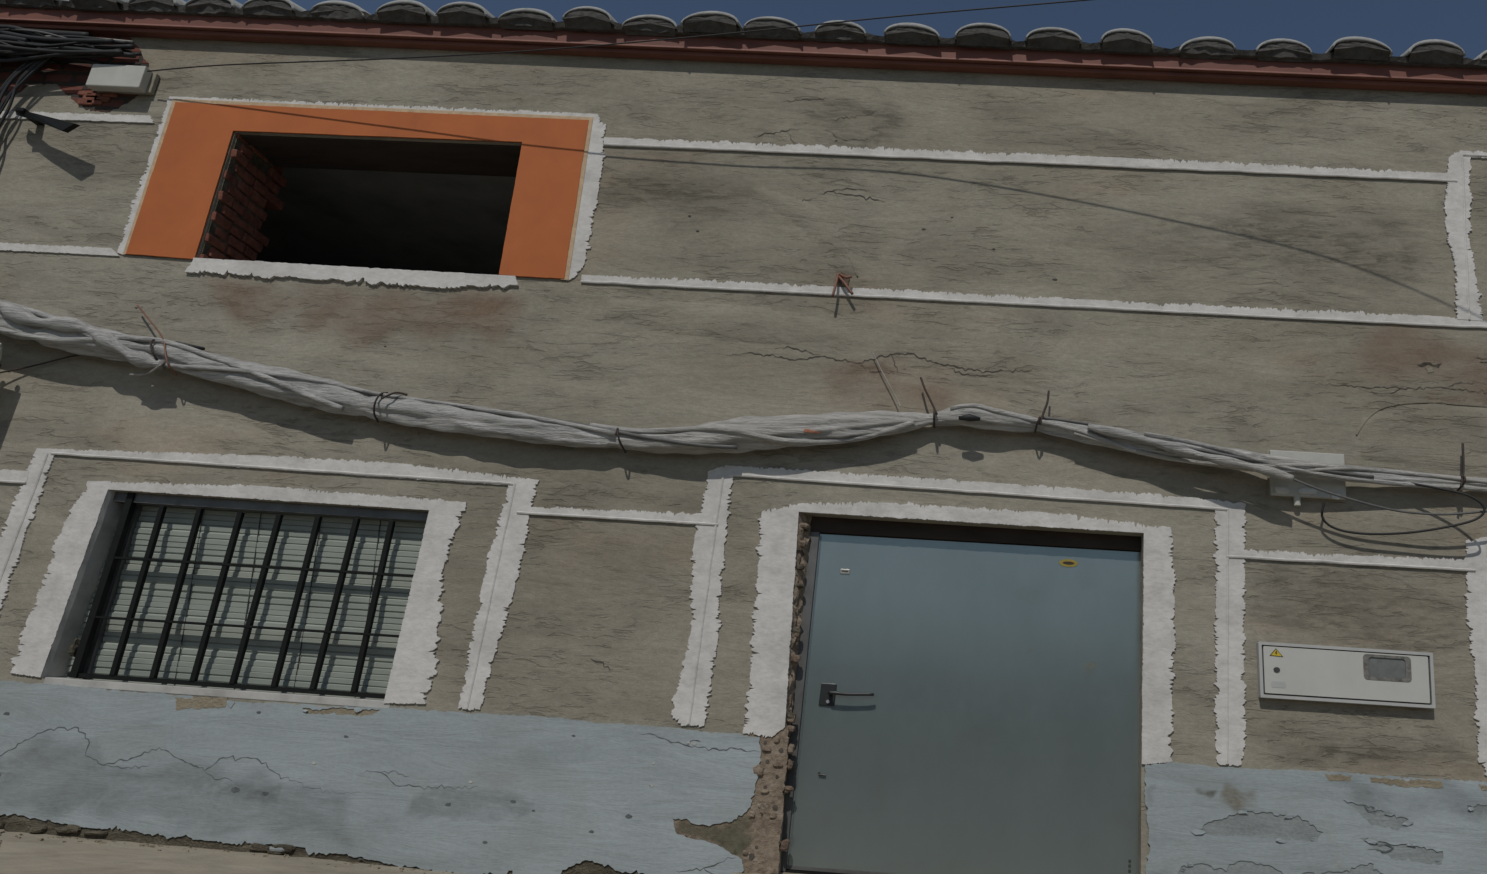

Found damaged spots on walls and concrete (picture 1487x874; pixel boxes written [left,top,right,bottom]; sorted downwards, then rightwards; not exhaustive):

spalling [0,35,149,112]
crack [715,346,1037,376]
spalling [673,513,812,874]
crack [0,727,478,794]
peeling [1370,777,1444,789]
spalling [0,814,432,871]
spalling [561,860,644,874]
peeling [1178,861,1283,874]
peeling [1191,810,1323,843]
peeling [1303,800,1443,874]